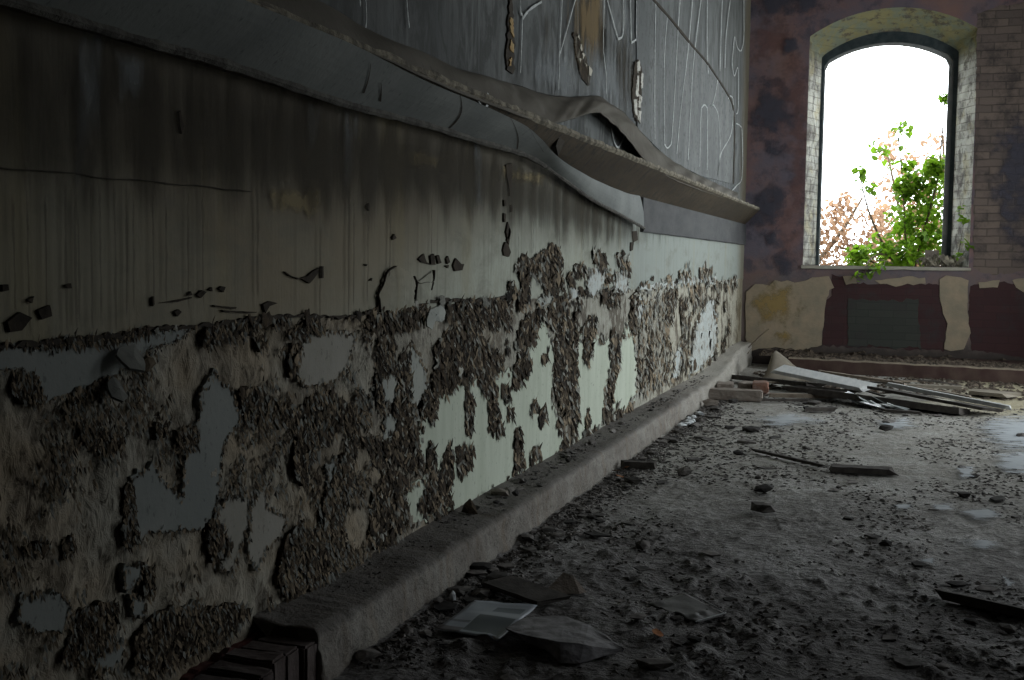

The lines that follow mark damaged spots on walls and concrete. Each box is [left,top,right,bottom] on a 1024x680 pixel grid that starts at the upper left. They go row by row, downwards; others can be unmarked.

peeling [571,32,592,86]
flaking render [630,59,644,123]
flaking render [745,2,1024,358]
damp [750,185,794,275]
peeling [0,242,739,680]